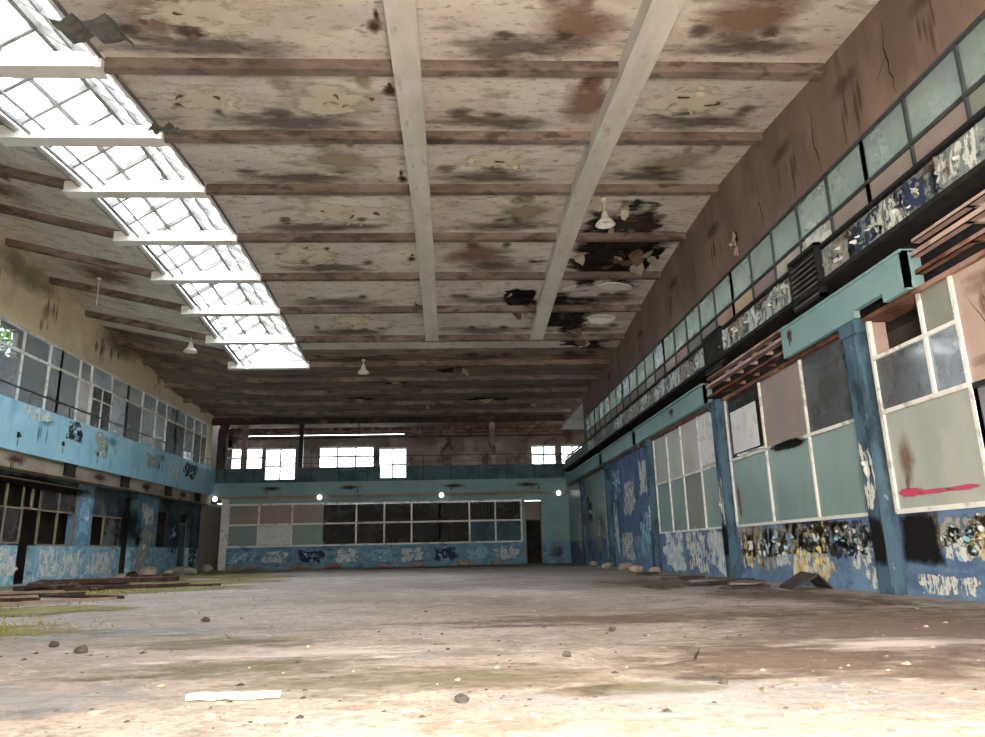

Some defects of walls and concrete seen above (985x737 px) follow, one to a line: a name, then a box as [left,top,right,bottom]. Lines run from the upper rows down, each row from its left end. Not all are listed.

leakage [470,0,611,60]
peeling [621,199,643,221]
peeling [802,127,982,274]
peeling [568,228,659,283]
leakage [8,253,58,329]
peeling [858,442,876,510]
peeling [0,546,18,577]
peeling [737,519,879,590]
peeling [918,574,982,597]
peeling [929,512,985,562]